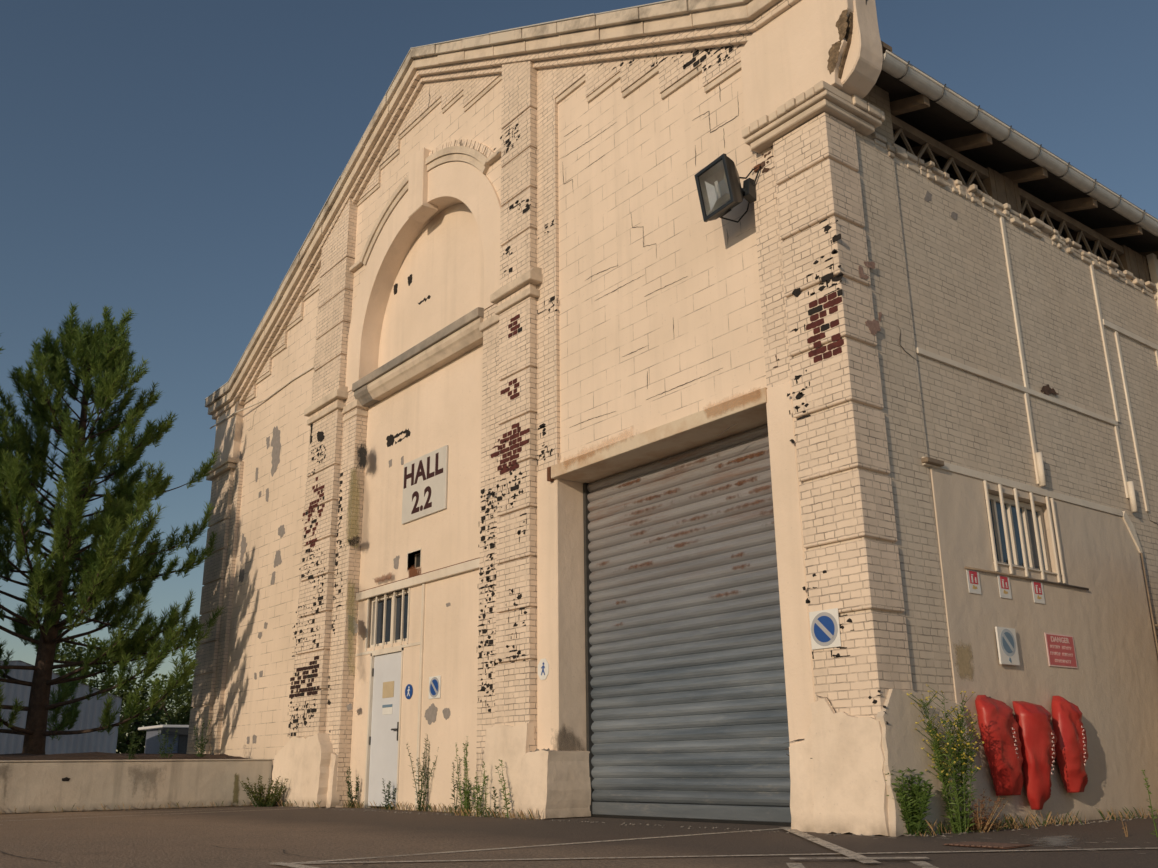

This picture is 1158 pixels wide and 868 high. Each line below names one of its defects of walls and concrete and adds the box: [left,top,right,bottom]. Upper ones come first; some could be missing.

flaking render [598,45,741,71]
flaking render [827,10,848,74]
crack [562,123,615,185]
crack [692,84,739,165]
crack [588,217,685,301]
flaking render [787,219,844,420]
crack [623,345,722,400]
peeling [255,426,281,502]
peeling [239,533,247,582]
peeling [271,525,285,585]
flaking render [288,423,358,736]
flaking render [477,423,559,713]